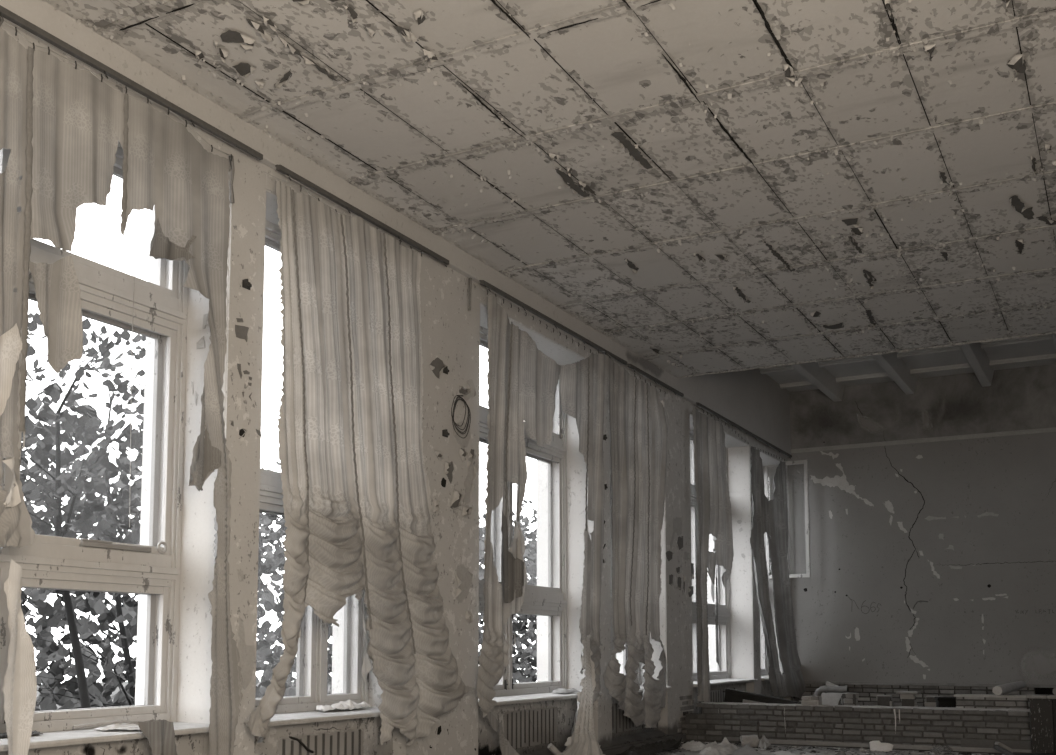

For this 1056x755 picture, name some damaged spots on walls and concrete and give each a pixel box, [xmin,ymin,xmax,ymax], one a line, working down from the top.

peeling [41,0,1056,379]
flaking render [810,451,907,533]
flaking render [904,601,930,679]
crack [855,401,1051,658]